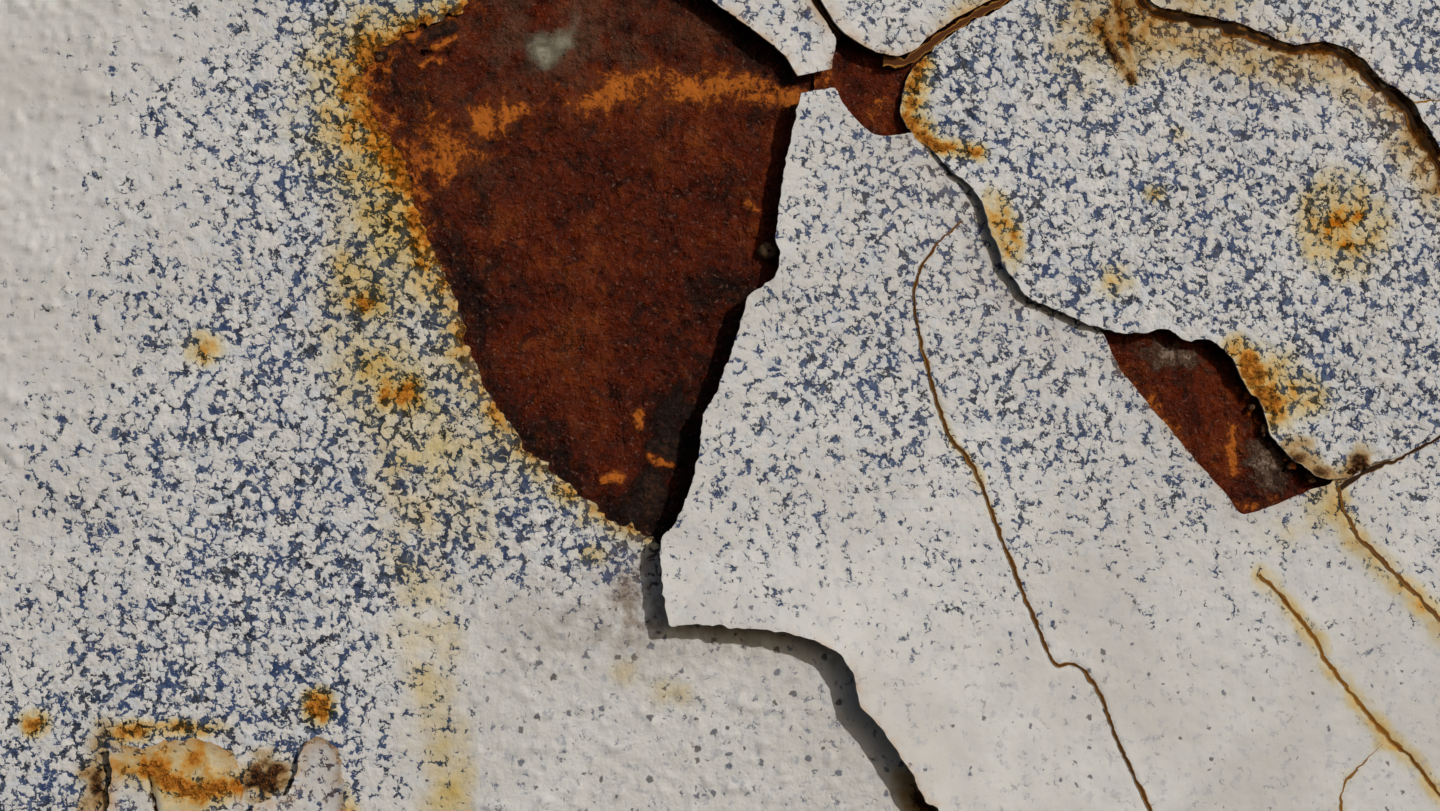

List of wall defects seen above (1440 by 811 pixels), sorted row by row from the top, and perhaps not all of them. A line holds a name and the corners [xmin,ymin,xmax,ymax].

corrosion [342,2,467,246]
crack [811,0,841,39]
crack [883,0,1008,68]
corrosion [1105,1,1136,83]
crack [1136,0,1440,178]
peeling [358,0,1440,811]
corrosion [1242,352,1281,413]
crack [913,220,1153,811]
crack [1337,436,1440,621]
peeling [107,736,346,811]
corrosion [245,759,288,792]
crack [1258,573,1440,811]